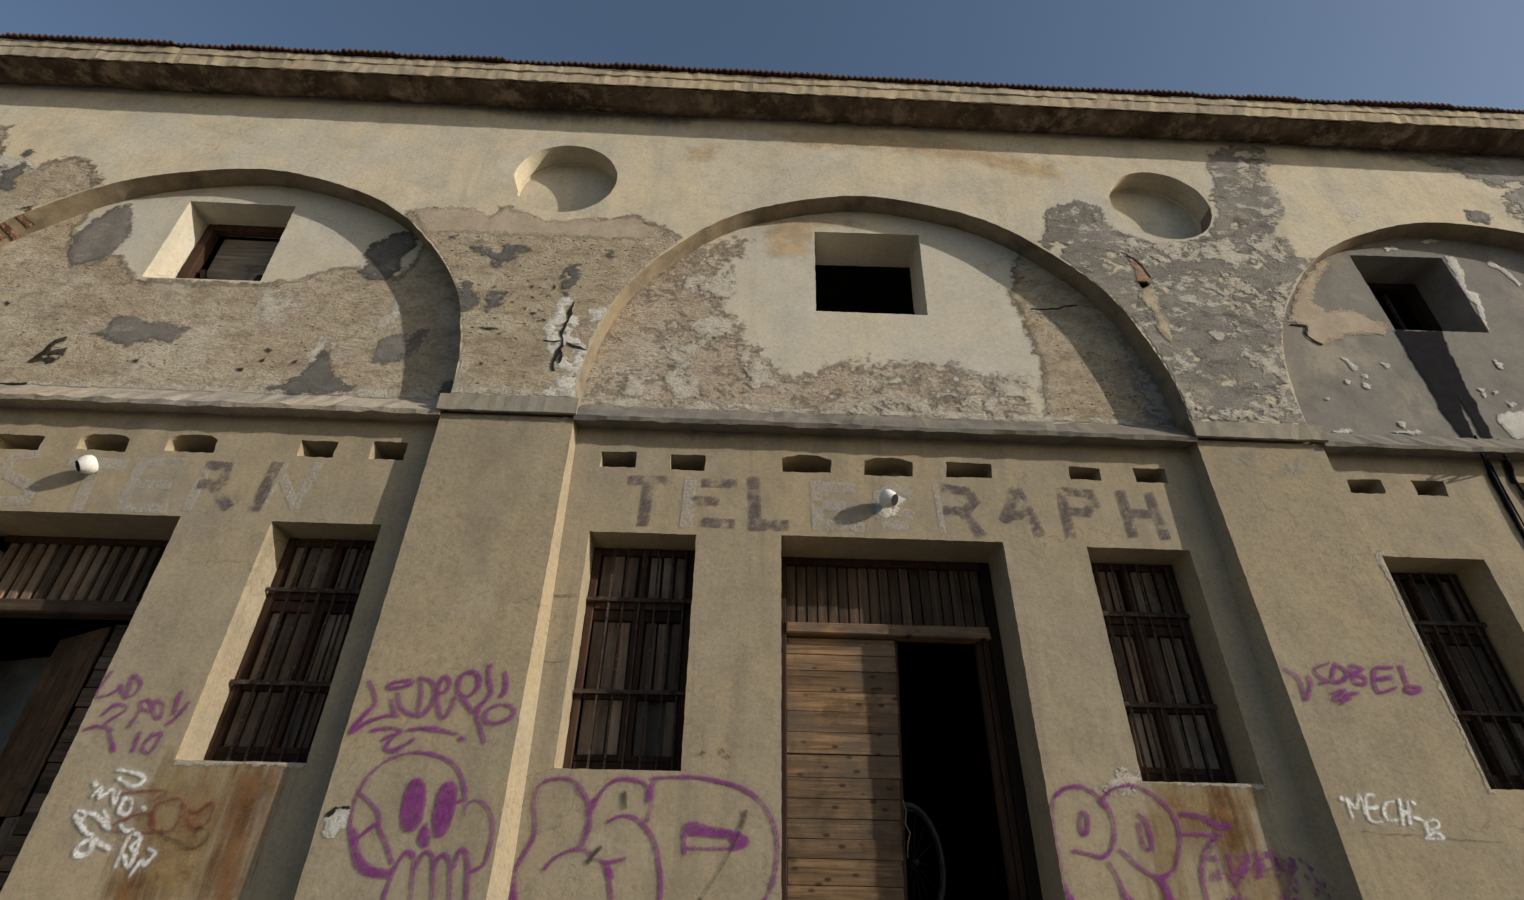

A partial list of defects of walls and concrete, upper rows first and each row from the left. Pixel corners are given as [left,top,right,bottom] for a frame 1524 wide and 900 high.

peeling [1411,152,1524,223]
spalling [0,124,1390,427]
peeling [1421,239,1490,331]
peeling [1487,261,1522,287]
crack [544,302,587,371]
peeling [1394,421,1421,435]
corrosion [123,765,279,900]
corrosion [1154,783,1254,876]